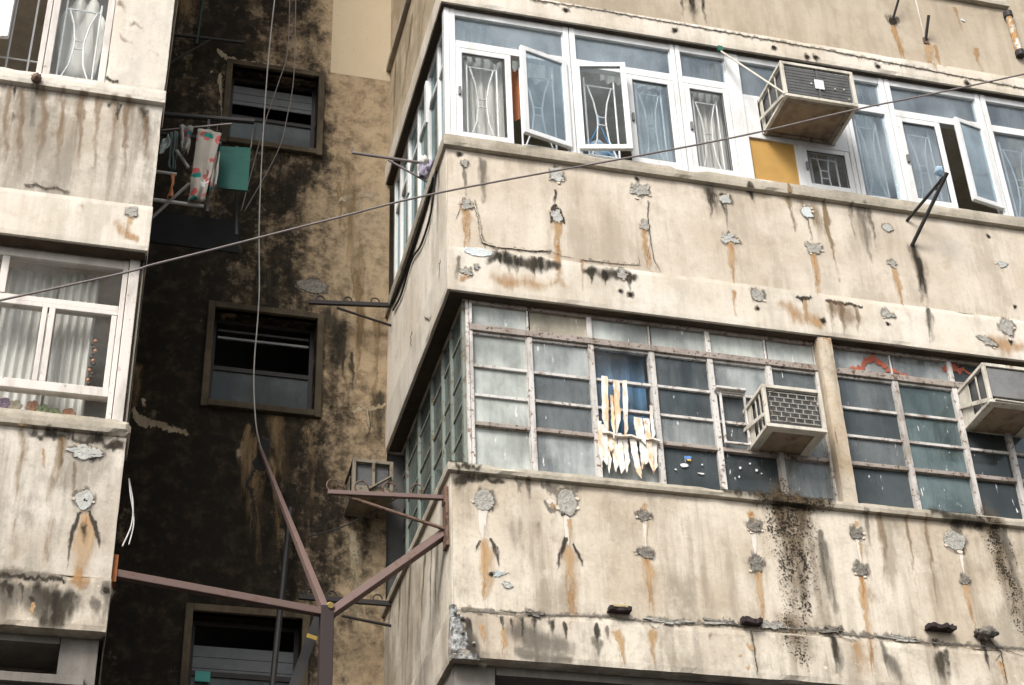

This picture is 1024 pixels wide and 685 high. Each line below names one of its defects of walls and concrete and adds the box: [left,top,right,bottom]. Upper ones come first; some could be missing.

crack [25,183,69,193]
damp [488,250,560,273]
crack [457,201,660,269]
rust [811,254,819,281]
spalling [65,443,104,460]
spalling [544,485,580,546]
damp [0,568,101,626]
rust [72,514,94,584]
rust [481,539,492,593]
damp [720,477,835,668]
damp [929,502,1024,635]
spalling [447,604,480,666]